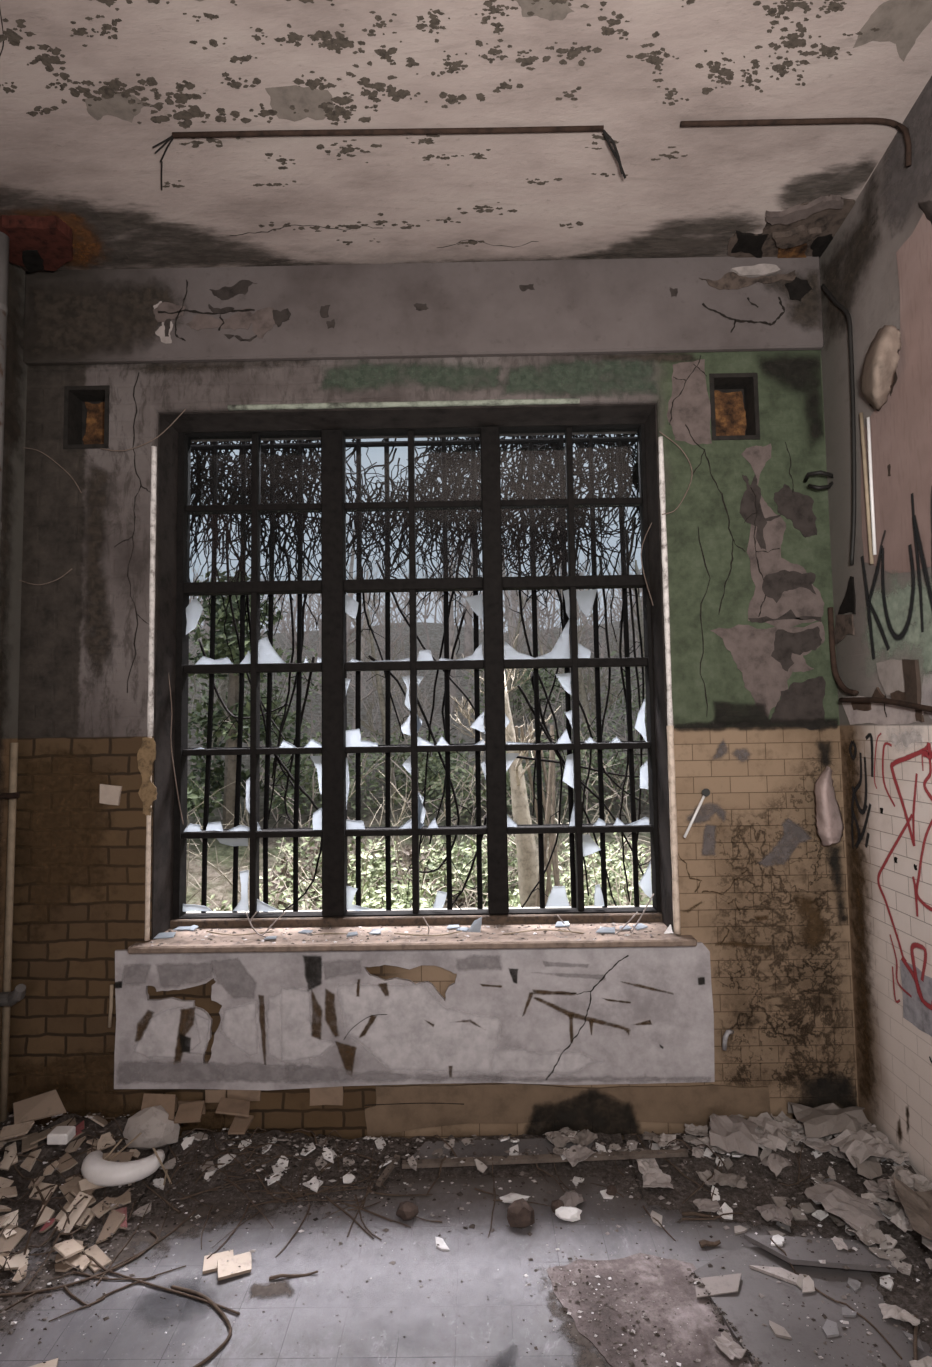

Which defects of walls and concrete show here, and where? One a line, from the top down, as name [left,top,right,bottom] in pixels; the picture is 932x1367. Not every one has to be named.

peeling [0,0,932,166]
peeling [253,153,296,187]
peeling [259,202,517,245]
peeling [153,280,291,344]
crack [702,297,785,332]
flaking render [711,443,932,730]
water stain [675,702,874,1109]
crack [546,955,629,1080]